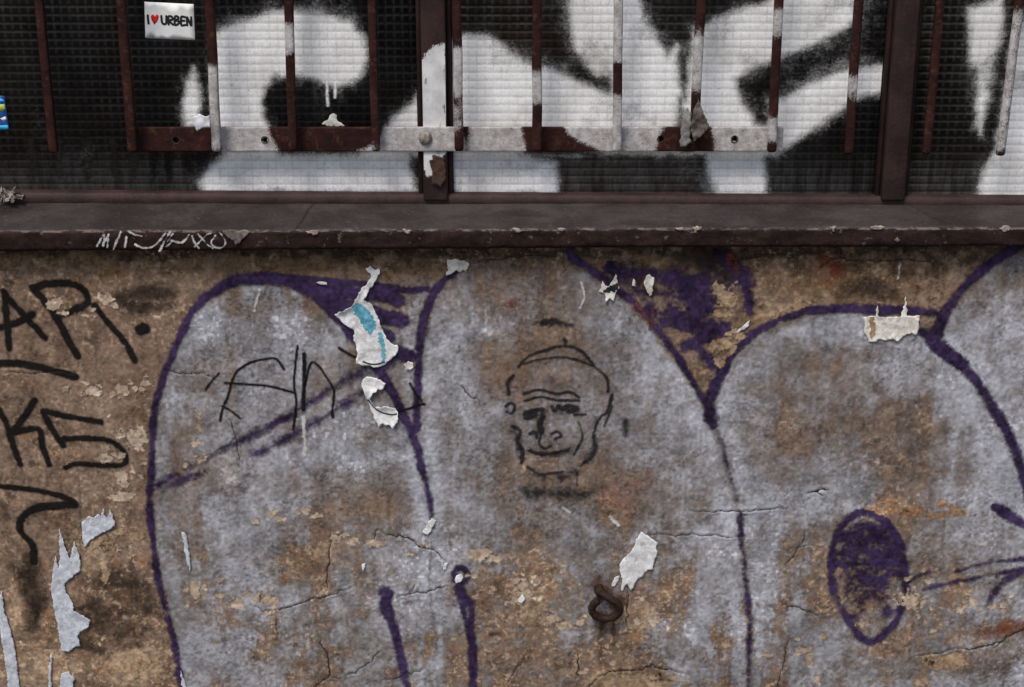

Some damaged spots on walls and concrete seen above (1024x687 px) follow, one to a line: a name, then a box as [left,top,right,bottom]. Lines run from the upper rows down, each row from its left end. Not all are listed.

spalling [707,280,748,368]
crack [648,507,779,538]
spalling [73,523,147,584]
crack [254,528,350,637]
crack [316,634,423,687]
crack [918,630,1023,656]